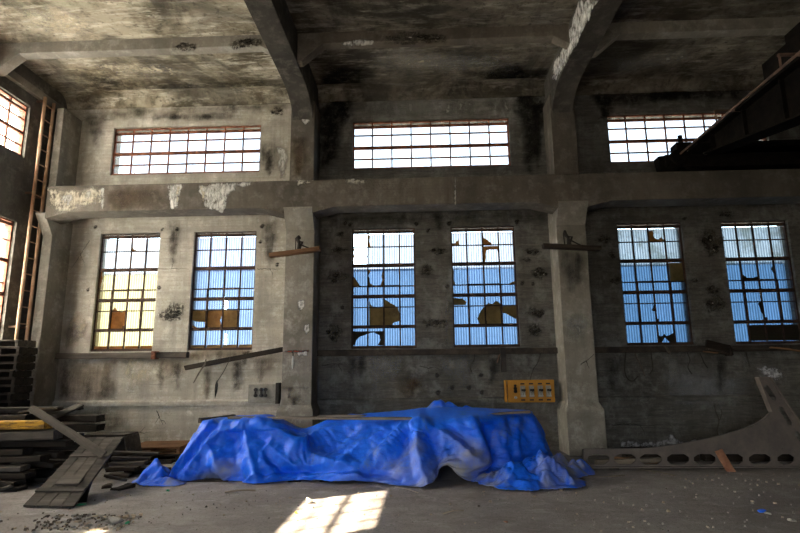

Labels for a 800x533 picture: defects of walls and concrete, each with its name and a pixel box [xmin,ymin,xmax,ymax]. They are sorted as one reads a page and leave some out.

peeling [50,188,98,211]
spalling [702,230,724,257]